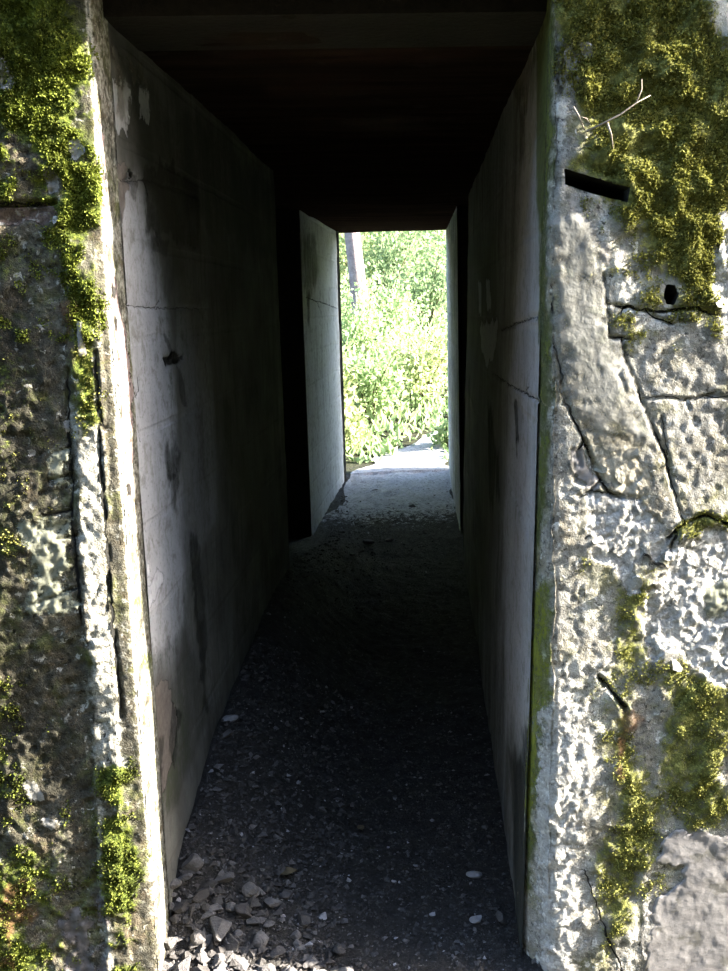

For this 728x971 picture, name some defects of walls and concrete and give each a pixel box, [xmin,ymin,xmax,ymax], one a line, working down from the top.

crack [0,200,51,208]
crack [40,375,82,624]
crack [93,358,123,715]
crack [602,273,728,550]
peeling [641,829,728,971]